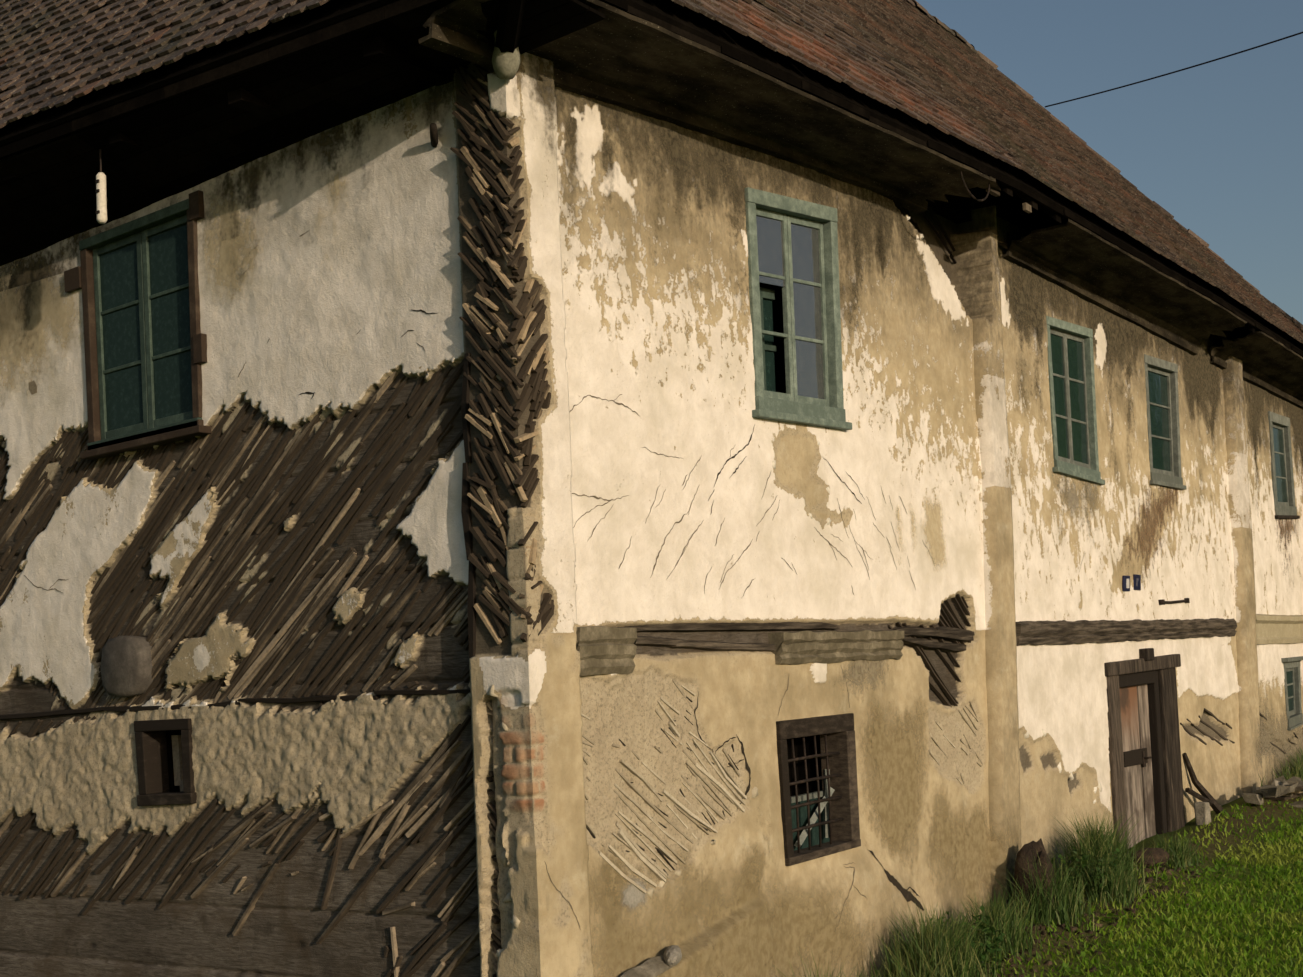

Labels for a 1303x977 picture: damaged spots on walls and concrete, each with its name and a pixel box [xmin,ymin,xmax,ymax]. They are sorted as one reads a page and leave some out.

damp [204,123,361,290]
damp [521,53,925,322]
damp [0,222,117,386]
crack [570,394,637,413]
peeling [556,91,973,527]
damp [1007,261,1303,474]
flaking render [0,459,158,708]
flaking render [150,488,216,606]
flaking render [396,440,469,585]
crack [572,425,780,596]
peeling [1019,725,1113,881]
crack [829,850,924,926]